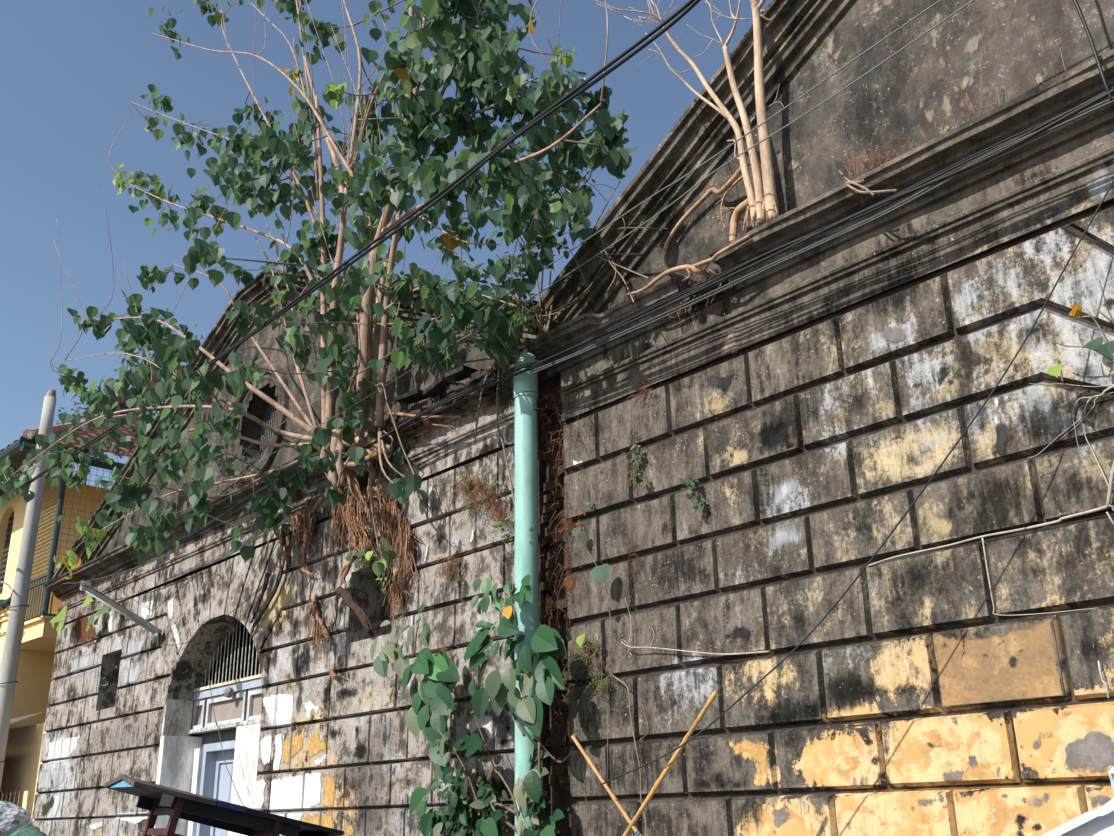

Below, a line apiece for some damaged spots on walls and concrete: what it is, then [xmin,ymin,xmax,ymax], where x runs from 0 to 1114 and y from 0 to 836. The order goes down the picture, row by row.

flaking render [855,0,893,26]
leakage [723,329,738,353]
leakage [912,363,950,387]
leakage [758,422,791,454]
leakage [994,423,1010,454]
leakage [775,480,798,505]
leakage [774,526,798,547]
leakage [726,622,753,643]
peeling [304,701,319,736]
peeling [261,733,300,778]
peeling [771,787,789,832]